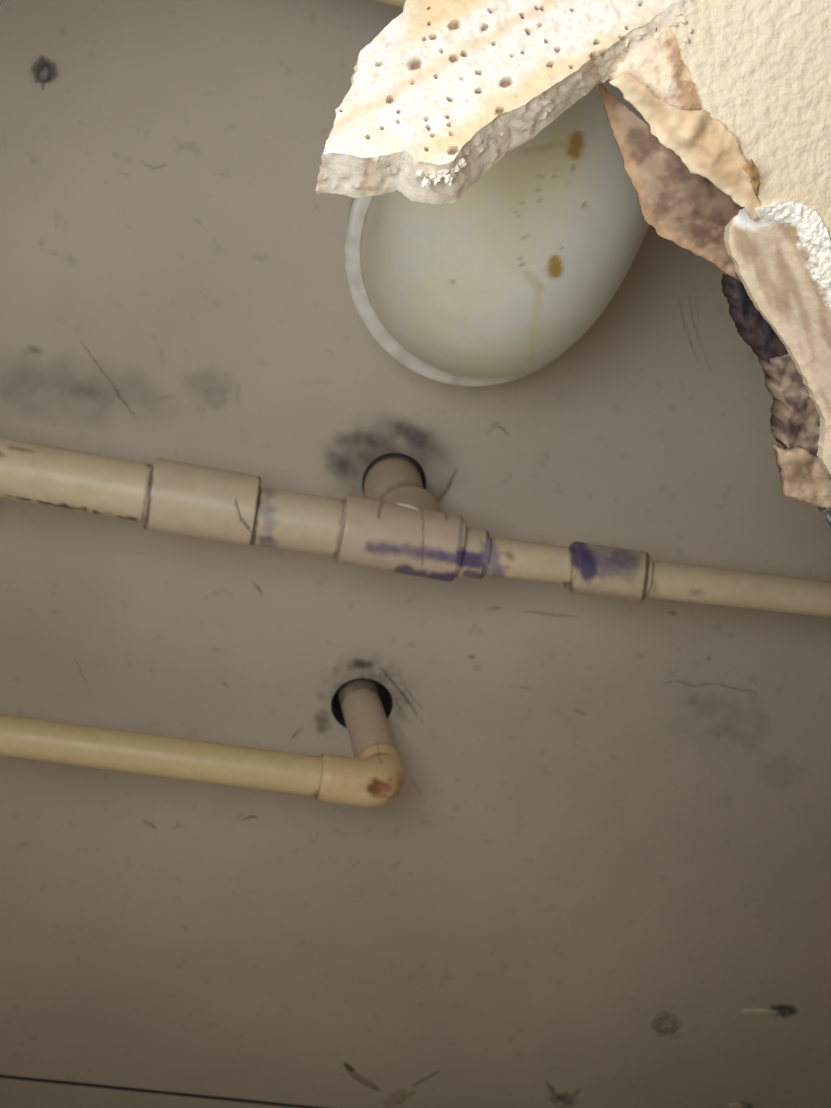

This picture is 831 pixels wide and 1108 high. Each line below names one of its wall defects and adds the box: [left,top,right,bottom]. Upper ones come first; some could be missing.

spalling [724,201,831,475]